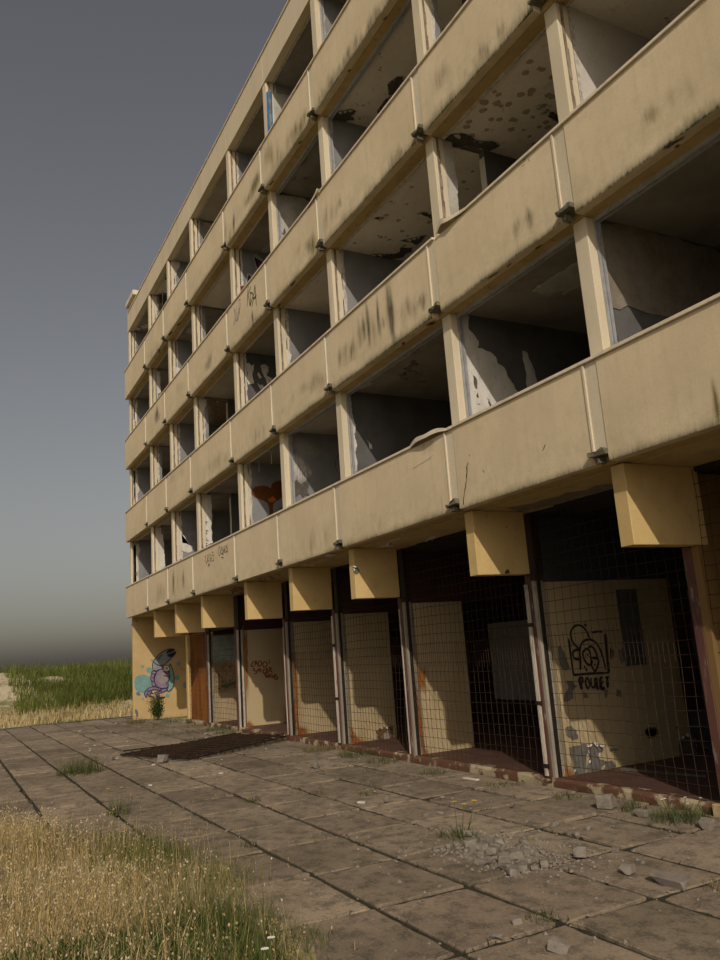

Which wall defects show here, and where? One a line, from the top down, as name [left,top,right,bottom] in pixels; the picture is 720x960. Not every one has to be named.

spalling [377,76,404,114]
spalling [535,105,559,124]
peeling [245,363,272,390]
peeling [463,315,537,415]